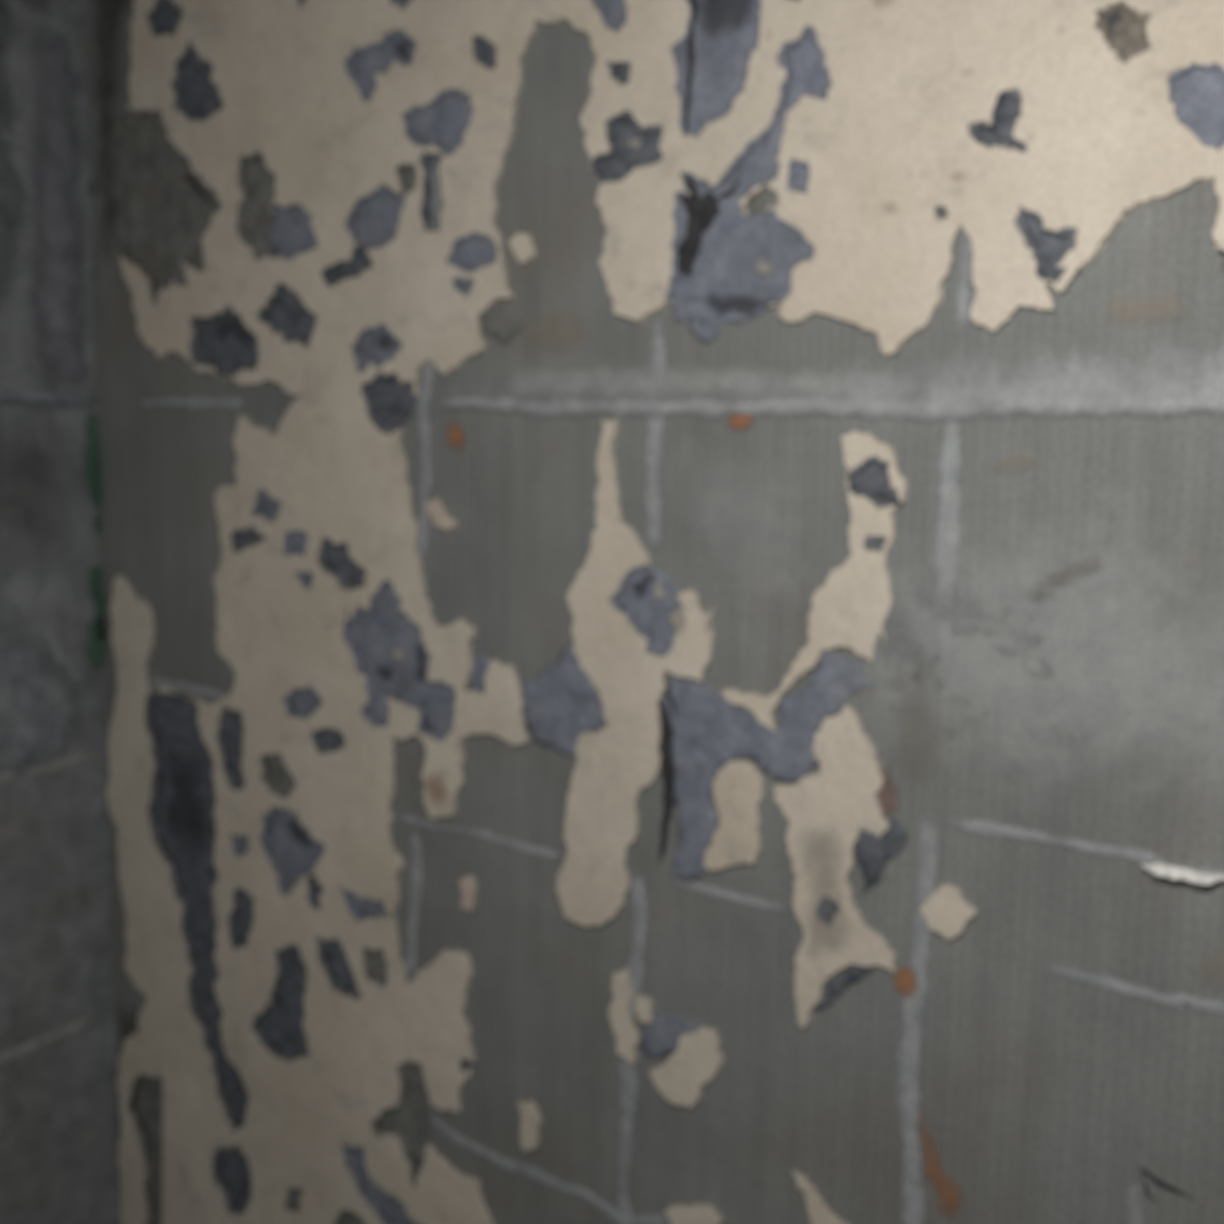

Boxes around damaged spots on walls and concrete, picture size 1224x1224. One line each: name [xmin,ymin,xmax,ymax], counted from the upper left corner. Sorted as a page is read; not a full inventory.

spalling [847,455,904,508]
spalling [864,536,887,552]
spalling [609,564,682,656]
spalling [521,643,608,758]
crack [658,676,678,863]
spalling [662,649,908,974]
peeling [1141,864,1224,886]
spalling [803,963,878,1029]
spalling [639,1011,707,1060]